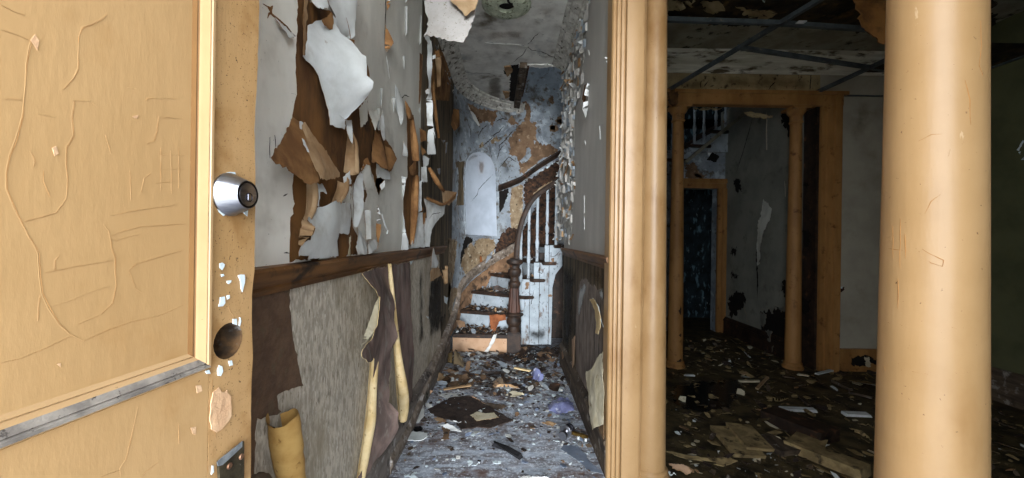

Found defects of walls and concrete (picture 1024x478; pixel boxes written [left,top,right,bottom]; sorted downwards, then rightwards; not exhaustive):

peeling [289,0,395,262]
peeling [445,3,590,245]
flaking render [457,205,496,282]
peeling [218,263,245,307]
peeling [196,360,233,432]